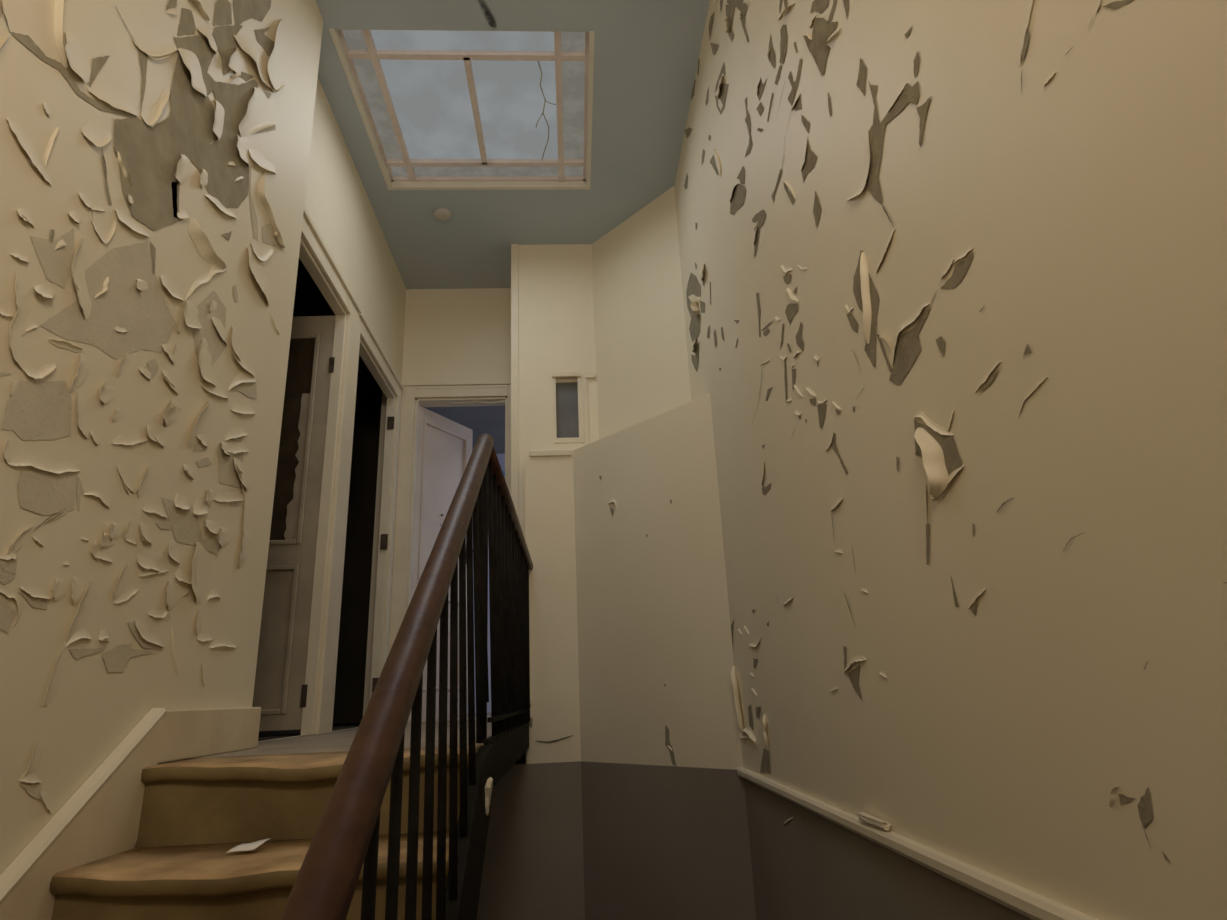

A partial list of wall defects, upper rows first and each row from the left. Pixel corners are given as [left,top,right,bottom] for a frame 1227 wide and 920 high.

peeling [702,135,721,177]
peeling [691,0,752,114]
peeling [730,0,848,257]
peeling [845,51,973,385]
peeling [1090,0,1132,24]
peeling [0,0,290,706]
peeling [686,263,739,372]
peeling [752,264,864,474]
peeling [913,410,964,565]
peeling [731,620,770,773]
peeling [831,646,866,700]
peeling [1109,787,1171,863]